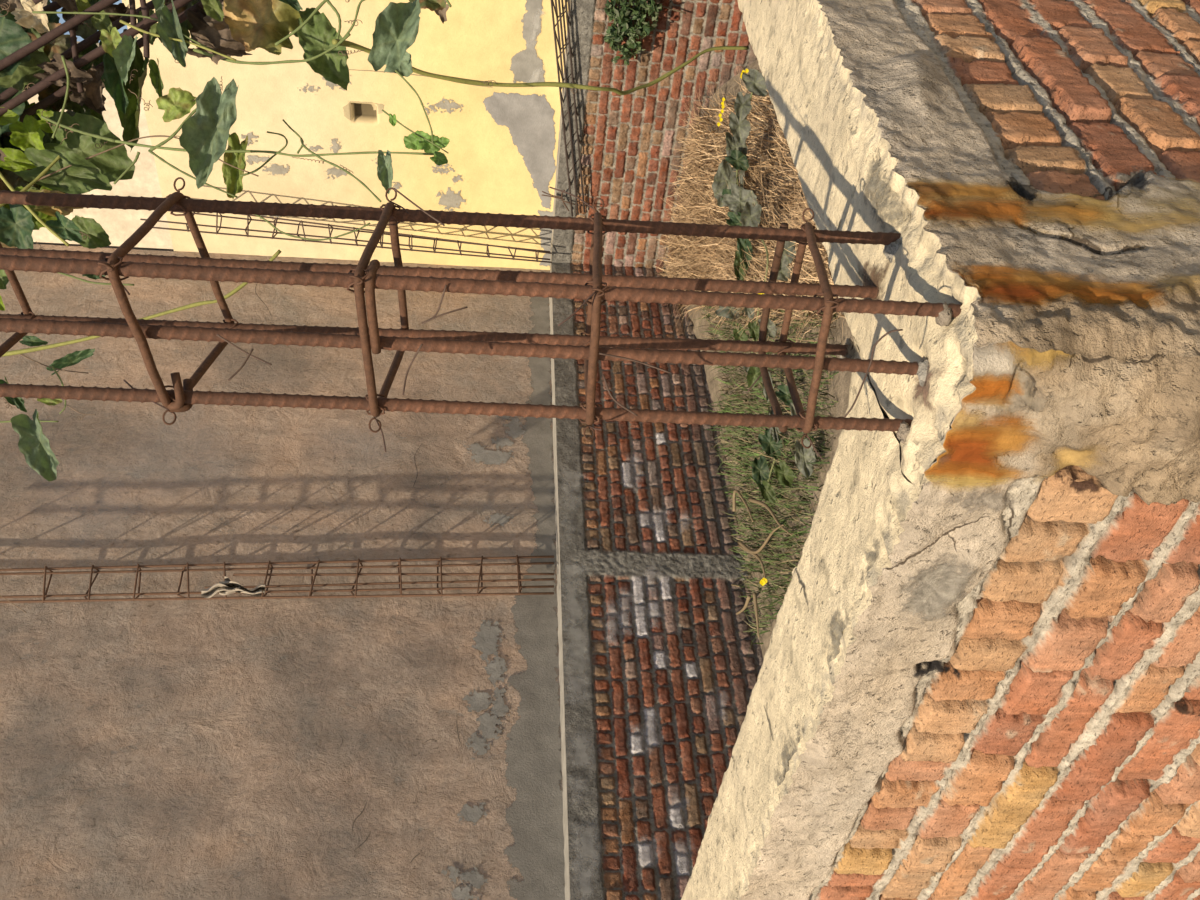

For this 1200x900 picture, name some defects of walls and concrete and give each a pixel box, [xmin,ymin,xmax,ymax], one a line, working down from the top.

peeling [420,98,463,114]
peeling [241,132,289,176]
peeling [305,138,347,180]
peeling [483,0,556,266]
peeling [432,163,466,211]
rust [907,182,1200,232]
rust [958,266,1199,308]
peeling [528,297,550,334]
rust [924,373,1033,487]
crack [881,500,1014,577]
peeling [458,357,565,900]